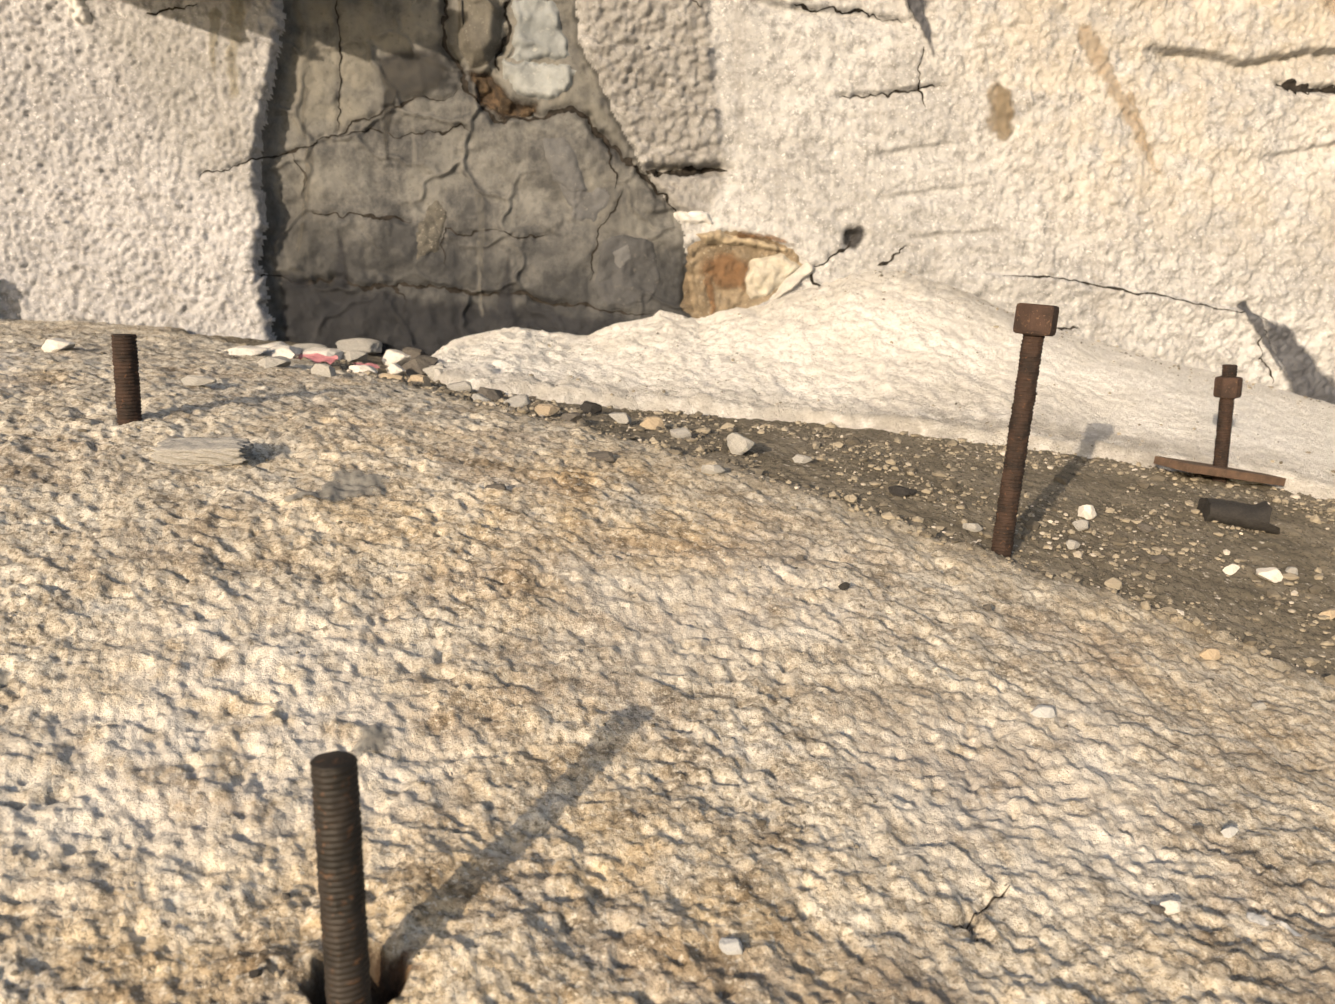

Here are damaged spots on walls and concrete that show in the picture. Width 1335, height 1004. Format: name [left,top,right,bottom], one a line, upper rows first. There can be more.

peeling [470,0,576,119]
crack [794,3,944,108]
crack [1276,78,1335,95]
crack [199,0,727,316]
crack [1002,275,1278,382]